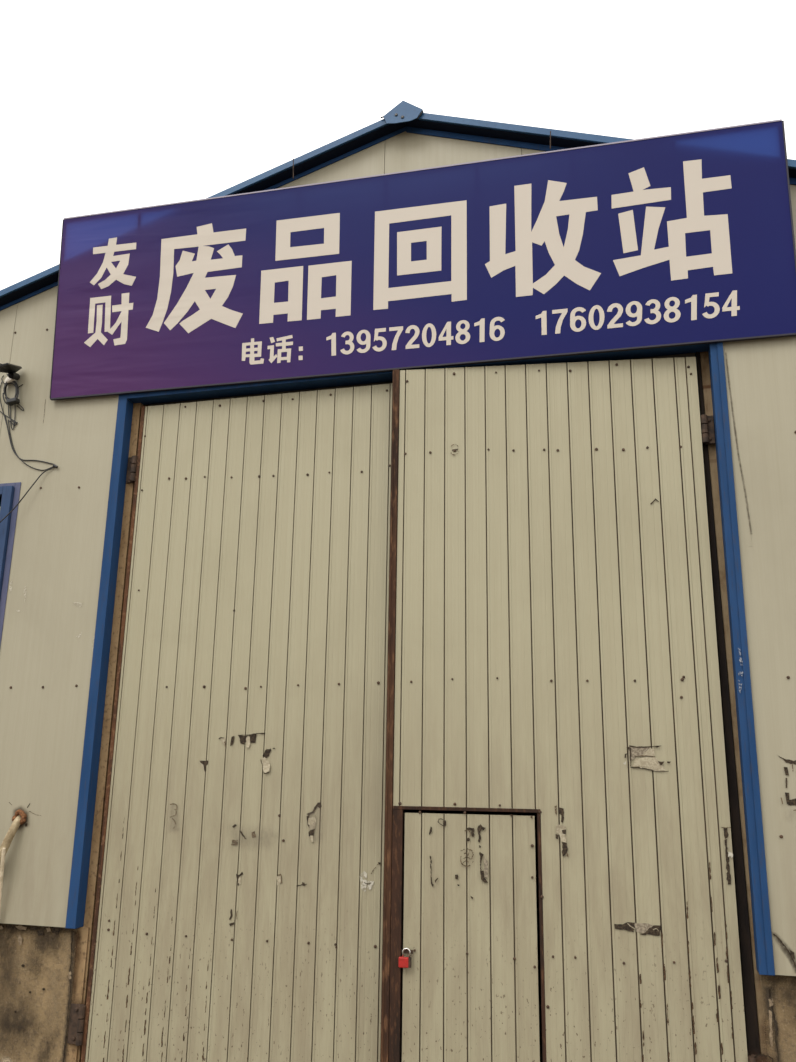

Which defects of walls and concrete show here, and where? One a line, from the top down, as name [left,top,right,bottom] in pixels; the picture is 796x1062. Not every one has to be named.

peeling [230,733,265,748]
peeling [262,748,275,773]
peeling [625,746,670,771]
peeling [307,802,321,842]
peeling [467,824,488,883]
peeling [614,922,663,947]